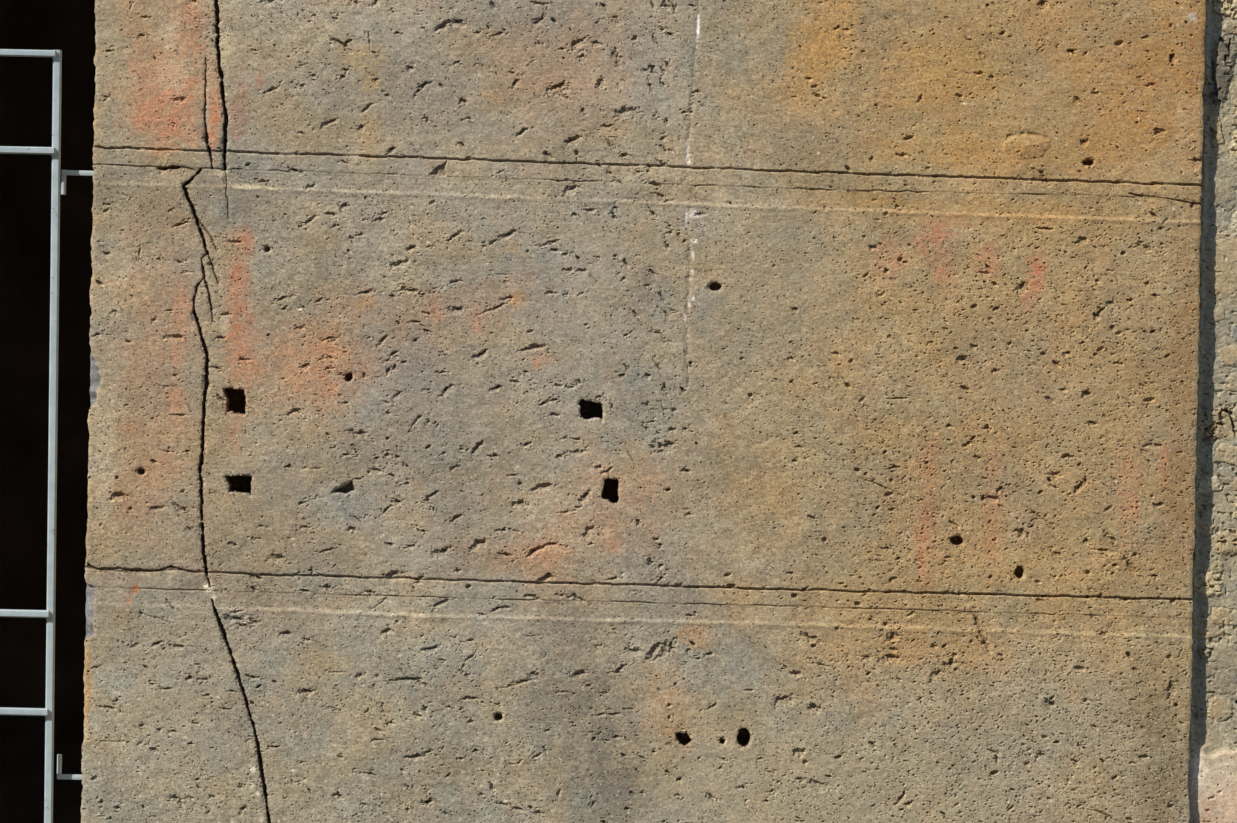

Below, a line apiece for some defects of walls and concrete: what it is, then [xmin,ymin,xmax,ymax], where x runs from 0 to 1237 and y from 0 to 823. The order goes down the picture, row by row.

crack [87,0,271,823]